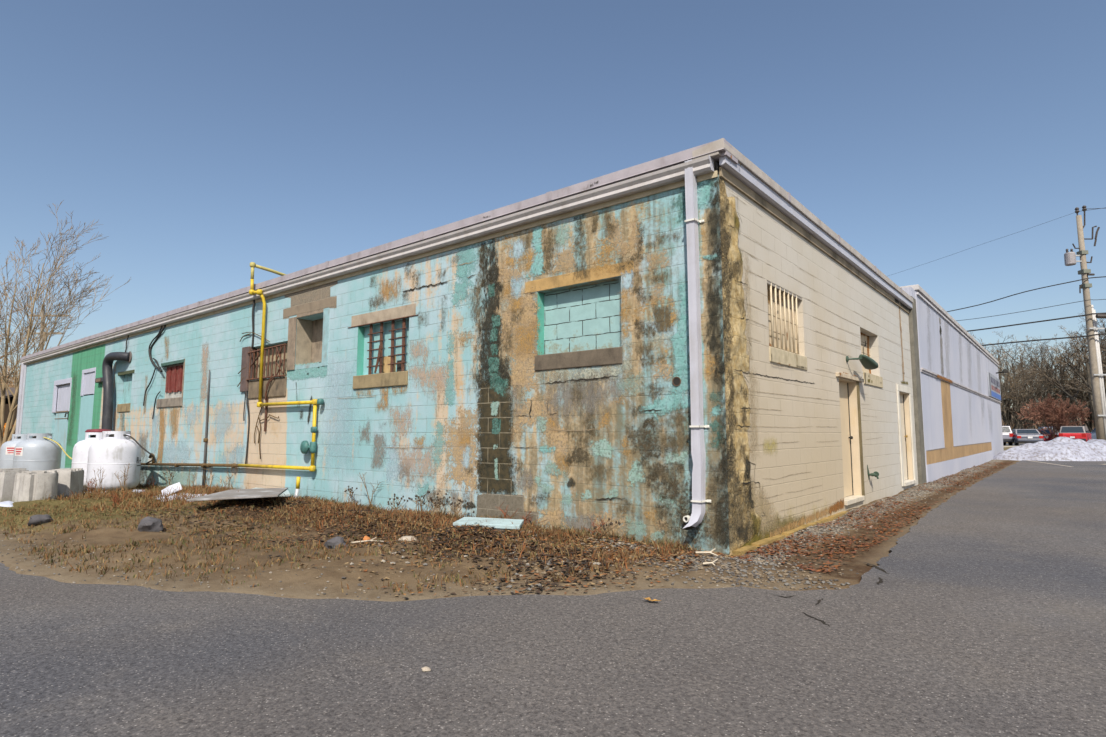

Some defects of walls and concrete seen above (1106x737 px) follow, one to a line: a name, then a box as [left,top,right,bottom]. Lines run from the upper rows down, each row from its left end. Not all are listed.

peeling [146,414,197,486]
peeling [387,331,480,496]
peeling [452,246,479,308]
water stain [427,237,549,526]
water stain [542,214,616,277]
peeling [499,225,691,541]
water stain [541,228,678,480]
peeling [591,203,669,272]
water stain [626,177,736,548]
peeling [672,178,762,553]